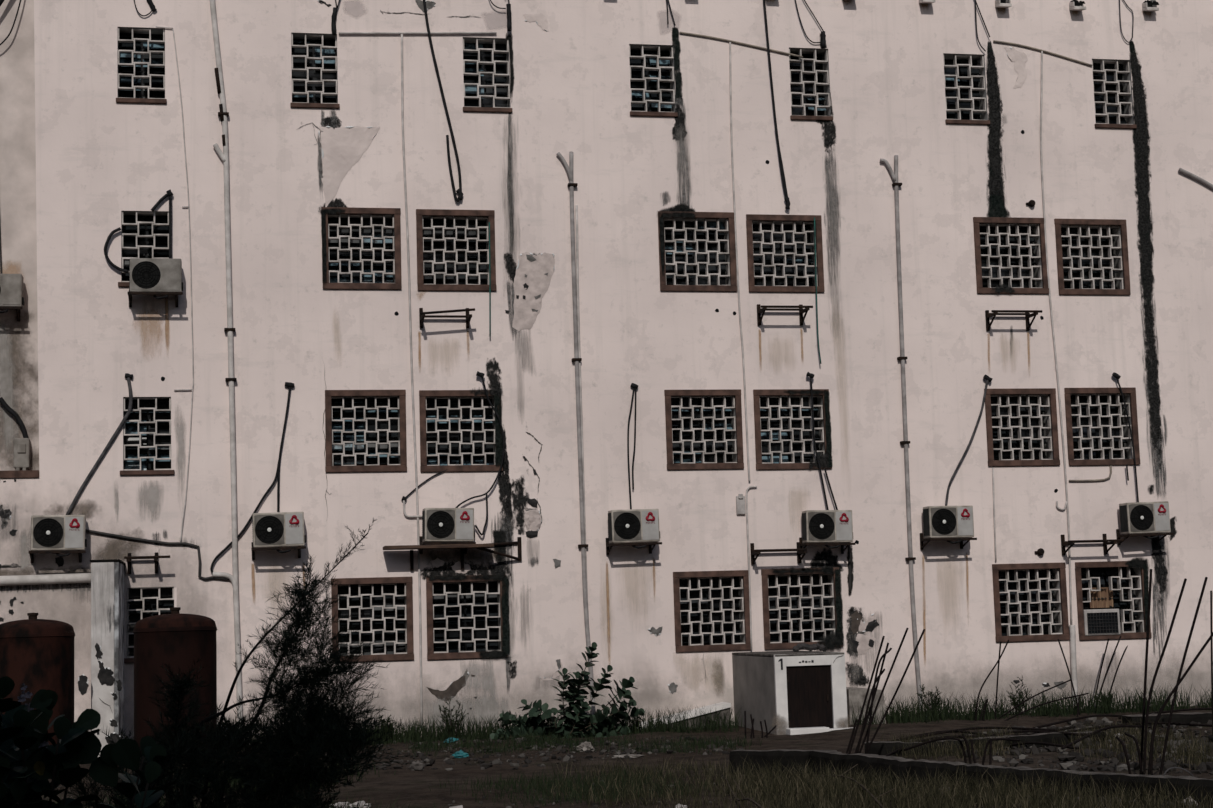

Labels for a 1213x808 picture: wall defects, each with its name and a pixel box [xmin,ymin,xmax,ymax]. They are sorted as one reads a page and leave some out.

spalling [416,0,436,12]
peeling [318,126,380,207]
leakage [659,28,695,275]
leakage [986,41,1009,217]
peeling [505,252,555,331]
leakage [1129,41,1166,496]
leakage [0,325,13,444]
leakage [772,545,854,651]